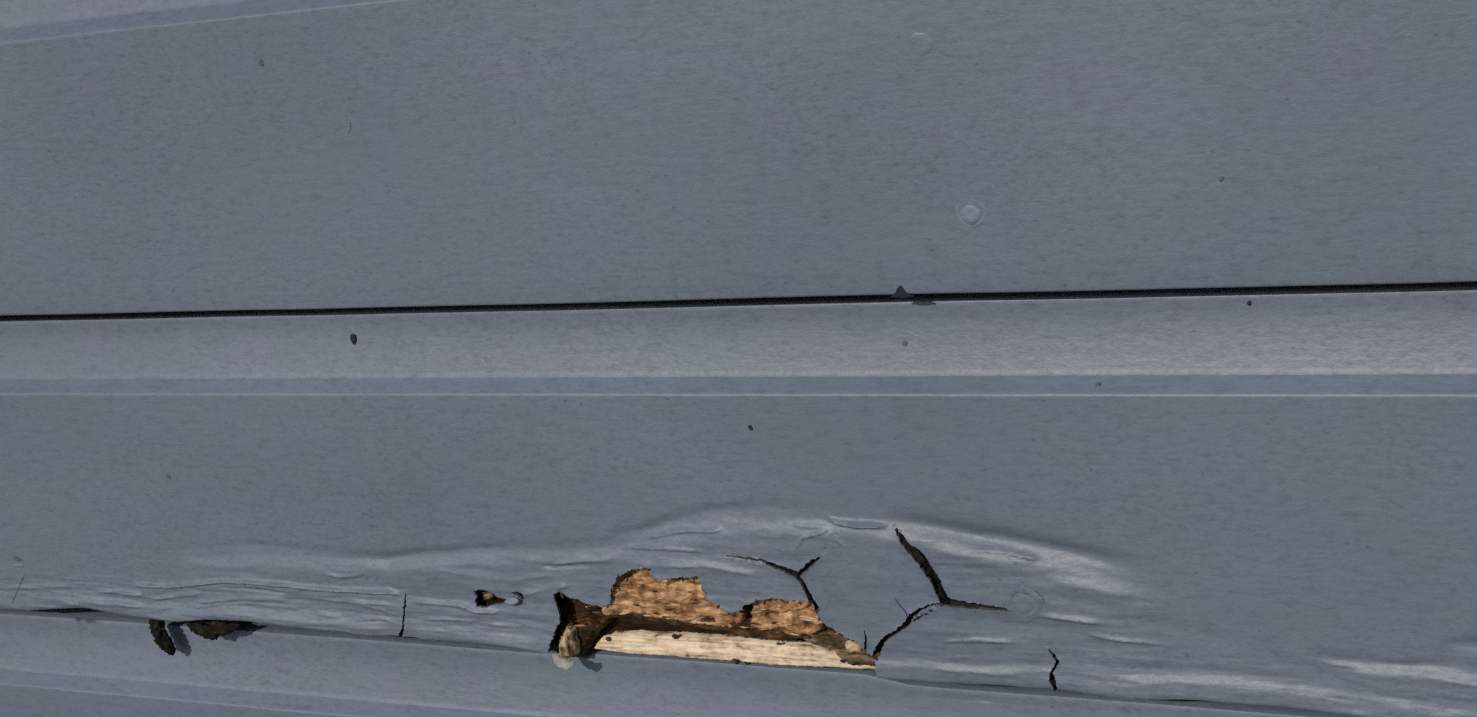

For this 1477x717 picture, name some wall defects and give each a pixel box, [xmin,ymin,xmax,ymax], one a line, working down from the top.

spalling [476,590,526,606]
crack [741,556,820,611]
crack [865,529,1007,656]
peeling [551,629,575,671]
spalling [590,618,725,651]
crack [1050,651,1060,691]